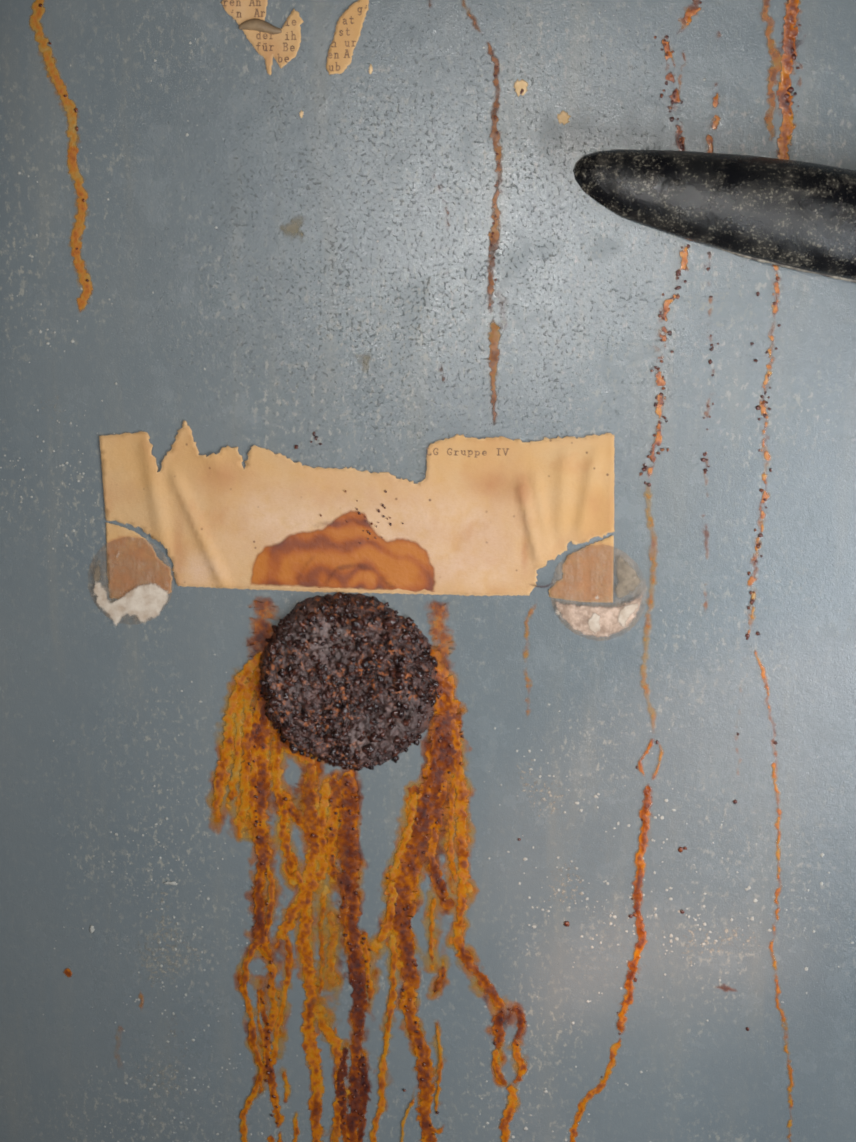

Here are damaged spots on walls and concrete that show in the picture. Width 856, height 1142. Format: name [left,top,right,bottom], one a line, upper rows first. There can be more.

rust [29,0,93,311]
rust [487,43,502,423]
rust [654,36,685,151]
rust [678,0,702,28]
rust [706,84,720,153]
rust [762,0,801,160]
rust [639,240,691,692]
rust [745,265,781,640]
rust [207,490,527,1142]
rust [569,740,663,1142]
rust [755,652,770,709]
rust [769,732,794,1138]